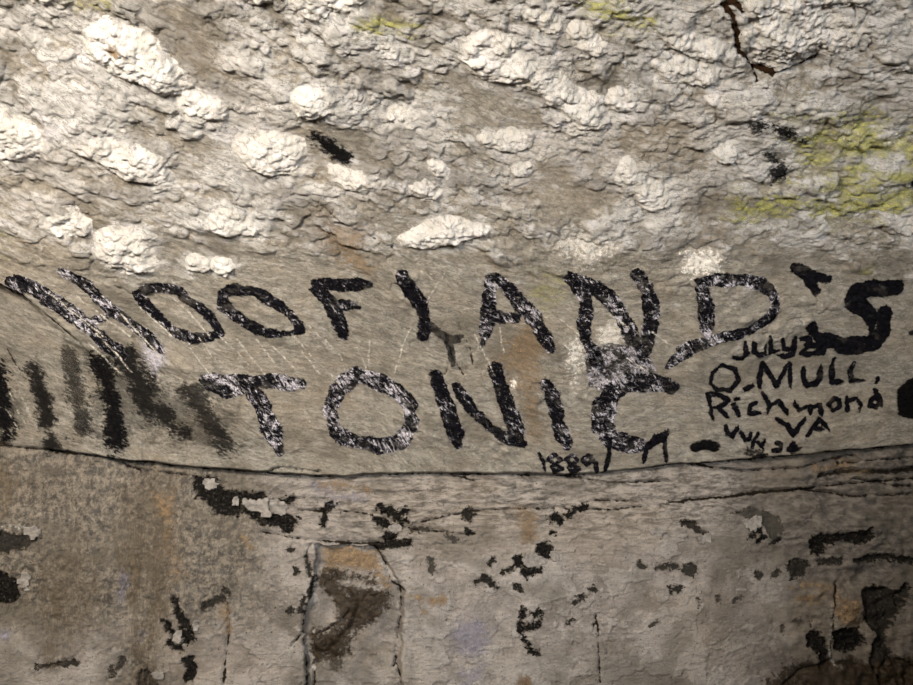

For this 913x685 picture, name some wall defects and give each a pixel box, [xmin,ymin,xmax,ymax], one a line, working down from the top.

crack [720,0,816,82]
crack [262,531,405,685]